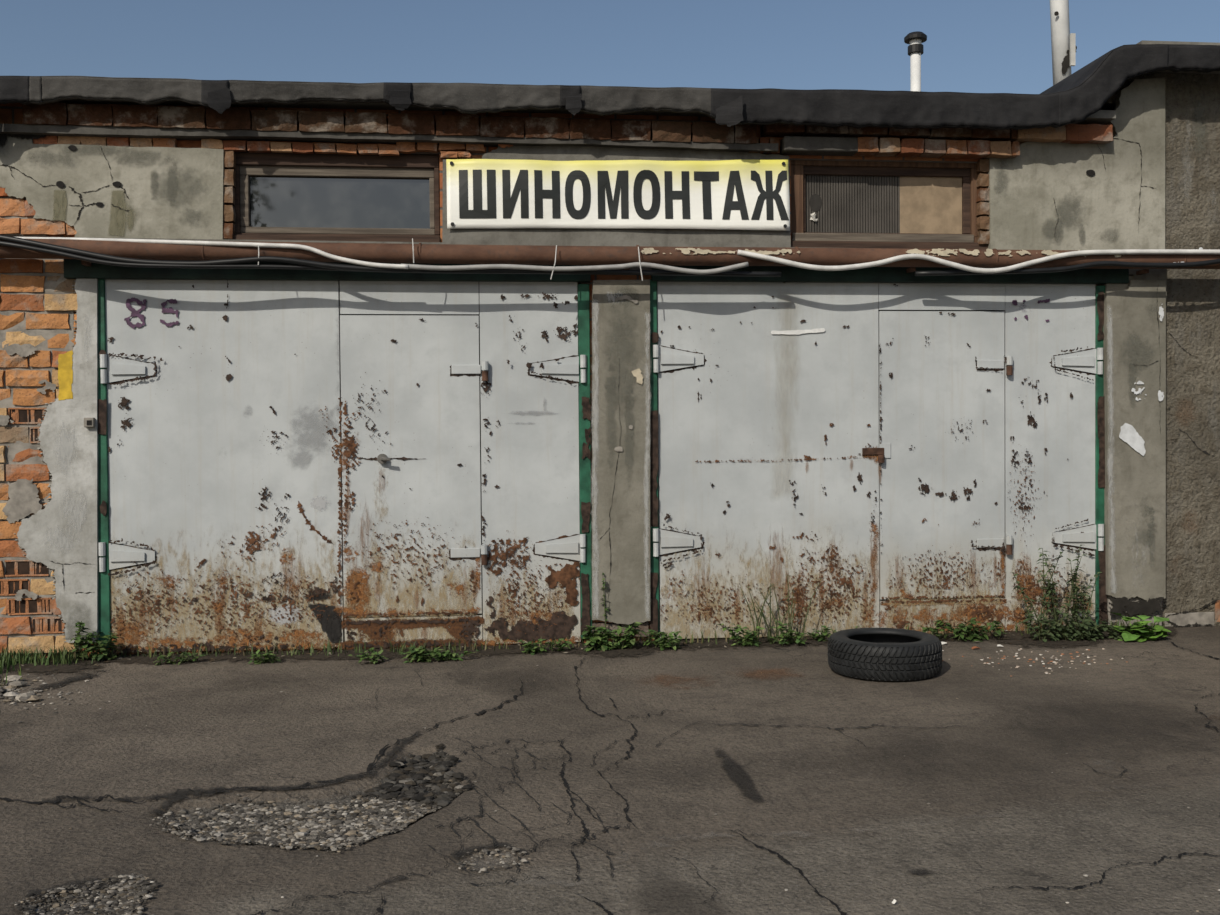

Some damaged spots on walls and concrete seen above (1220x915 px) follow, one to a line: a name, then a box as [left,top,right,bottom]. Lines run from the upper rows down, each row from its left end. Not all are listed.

crack [2,148,129,225]
crack [1099,138,1156,227]
spalling [0,258,81,655]
rust [582,397,591,459]
rust [650,410,658,527]
rust [1097,396,1105,488]
peeling [1119,423,1146,456]
rust [581,502,591,533]
rust [110,542,590,655]
rust [650,523,1108,639]
spalling [151,732,445,814]
spalling [28,876,137,904]